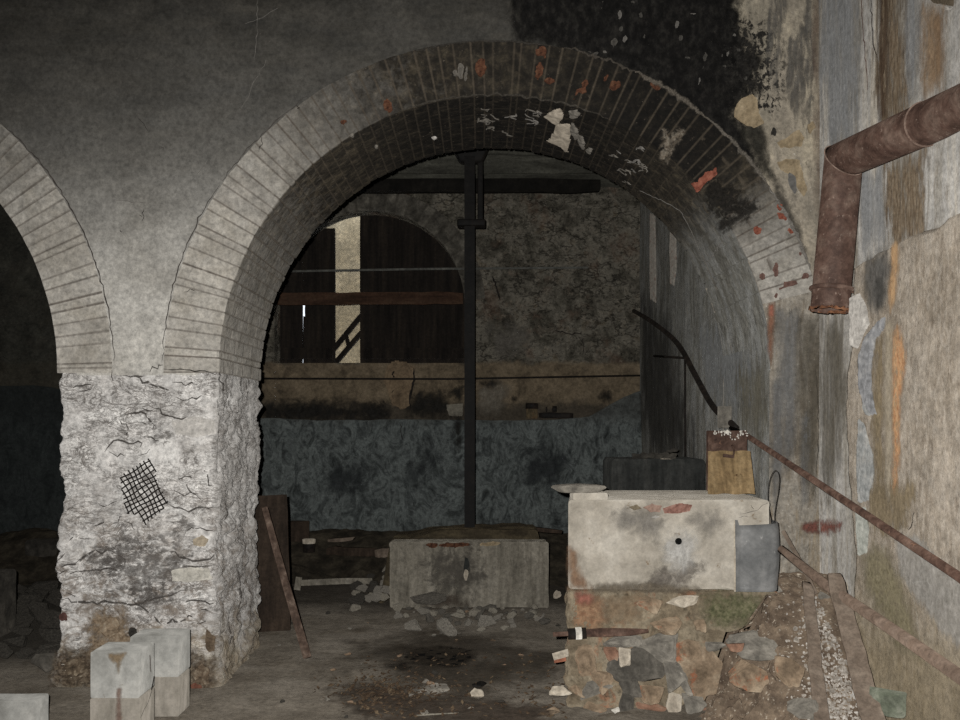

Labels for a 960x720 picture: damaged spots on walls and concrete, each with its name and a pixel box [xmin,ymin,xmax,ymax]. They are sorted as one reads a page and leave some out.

corrosion [875,0,908,121]
peeling [383,10,816,298]
damp [744,125,804,248]
corrosion [884,147,927,307]
corrosion [808,305,849,314]
corrosion [868,323,916,536]
crack [55,470,252,643]
corrosion [803,521,841,533]